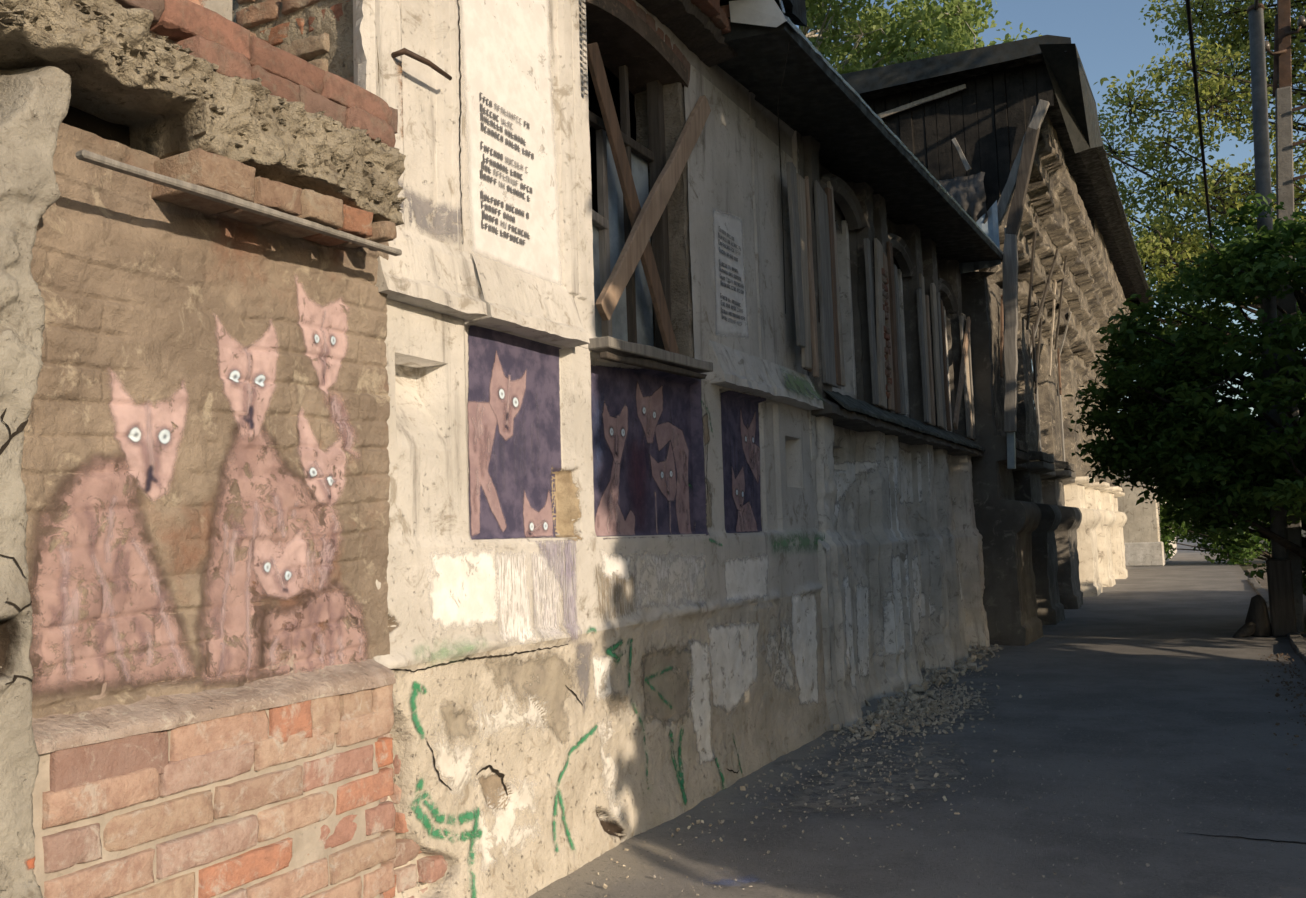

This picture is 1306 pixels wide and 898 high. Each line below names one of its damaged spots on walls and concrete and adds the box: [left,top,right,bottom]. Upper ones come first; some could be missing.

spalling [551,467,582,541]
crack [426,738,508,796]
spalling [434,652,573,870]